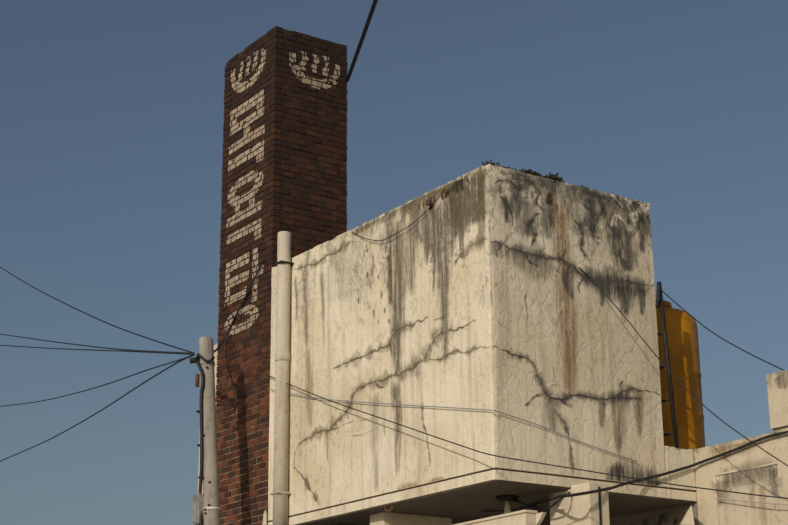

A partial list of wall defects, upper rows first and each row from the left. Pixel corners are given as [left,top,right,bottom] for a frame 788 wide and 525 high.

crack [292,241,358,270]
damp [380,171,485,363]
crack [456,179,653,295]
damp [585,226,645,314]
damp [393,385,402,455]
crack [293,316,659,504]
damp [600,398,621,448]